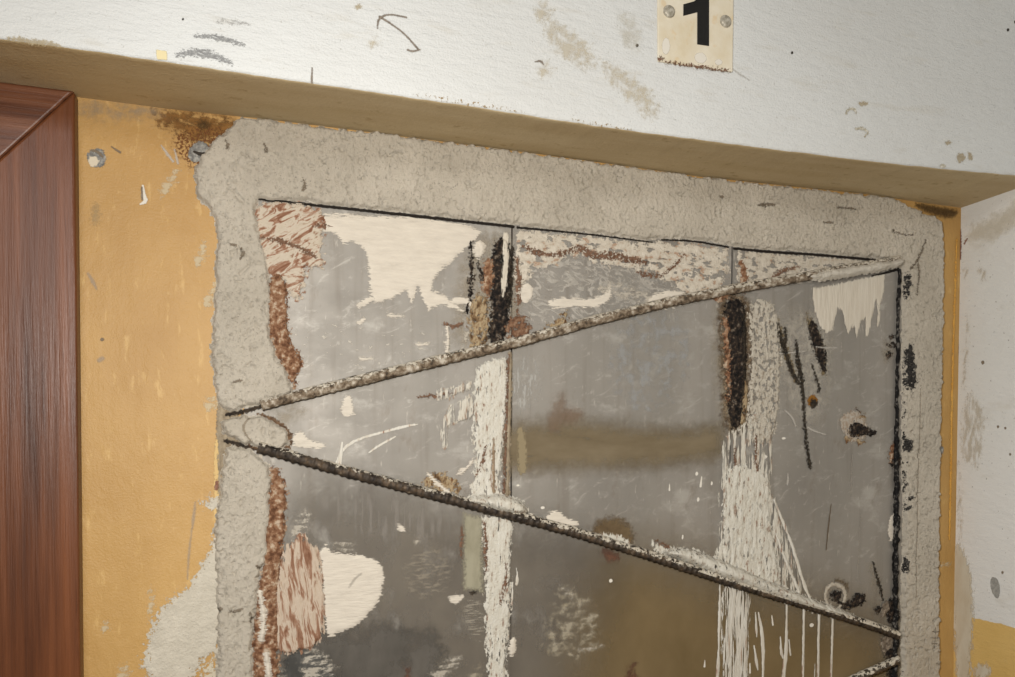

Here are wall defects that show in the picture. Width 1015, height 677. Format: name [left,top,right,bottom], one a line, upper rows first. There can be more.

rust [255,201,333,389]
water stain [322,297,407,371]
peeling [416,380,475,450]
water stain [443,232,696,497]
spalling [260,255,901,411]
water stain [711,259,752,433]
water stain [782,312,829,417]
rust [250,466,326,677]
peeling [507,637,517,657]
spalling [256,441,902,640]
water stain [281,434,889,677]
spalling [848,656,903,677]